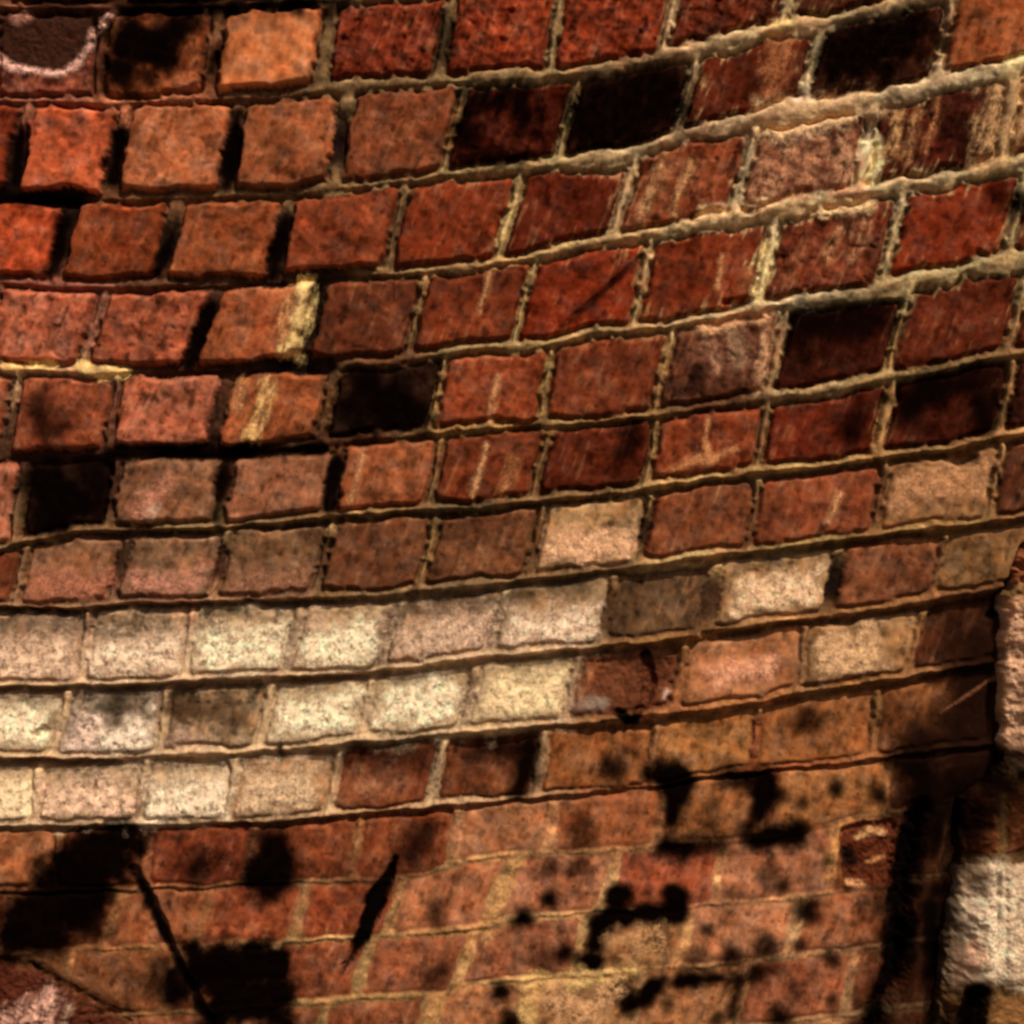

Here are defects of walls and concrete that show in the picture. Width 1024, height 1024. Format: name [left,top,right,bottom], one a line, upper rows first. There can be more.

water stain [277,277,324,359]